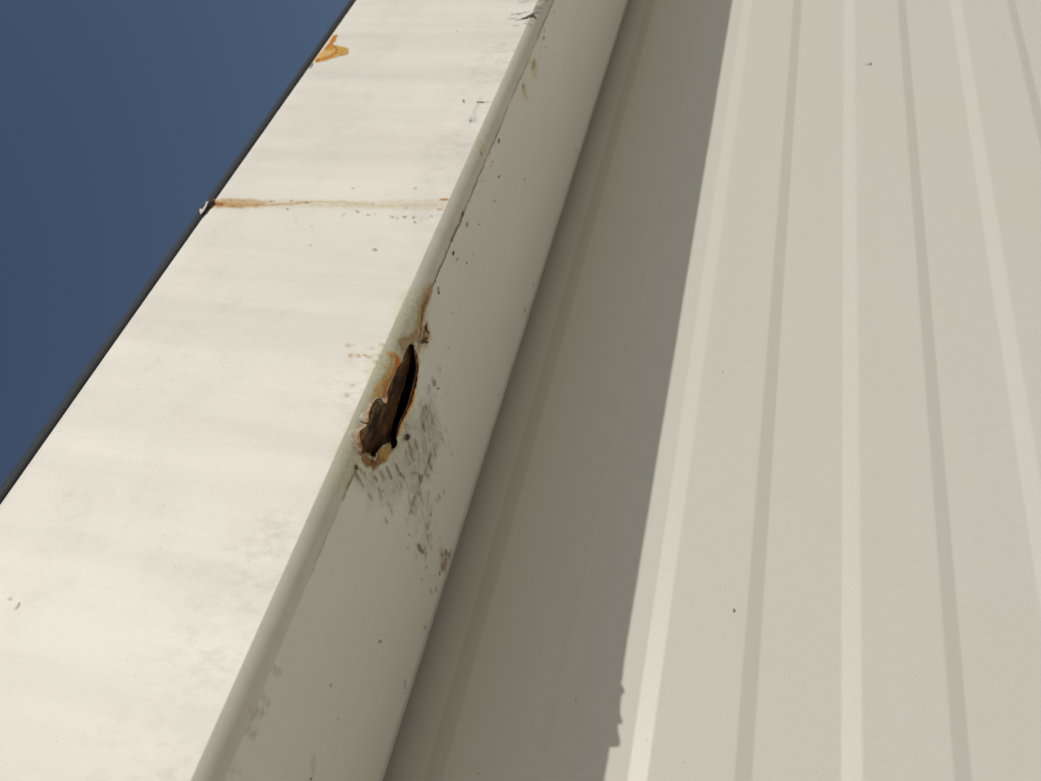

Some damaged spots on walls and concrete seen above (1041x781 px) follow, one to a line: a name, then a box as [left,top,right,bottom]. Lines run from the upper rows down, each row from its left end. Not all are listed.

corrosion [309,34,349,67]
corrosion [349,342,419,458]